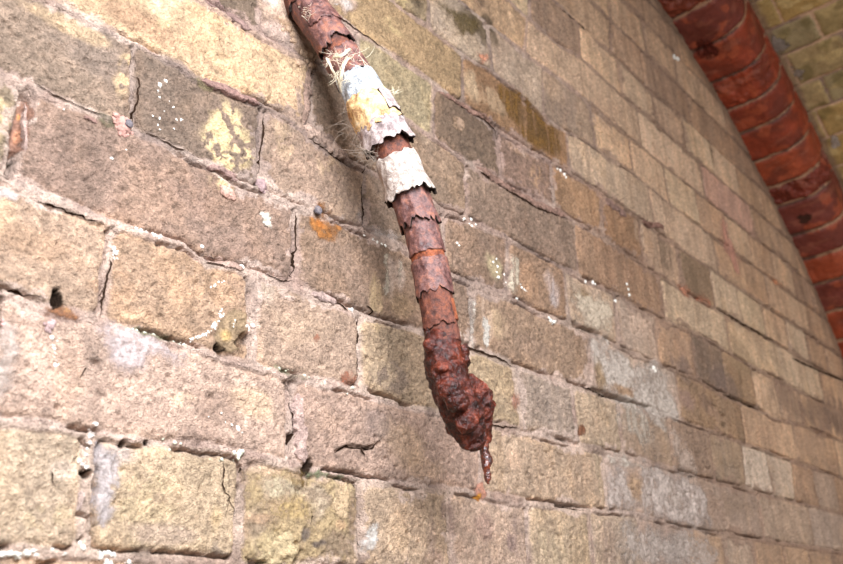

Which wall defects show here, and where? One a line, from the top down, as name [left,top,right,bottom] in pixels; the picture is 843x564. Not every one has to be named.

crack [266,212,297,282]
rust [310,203,341,240]
crack [336,439,381,456]
crack [222,462,241,517]